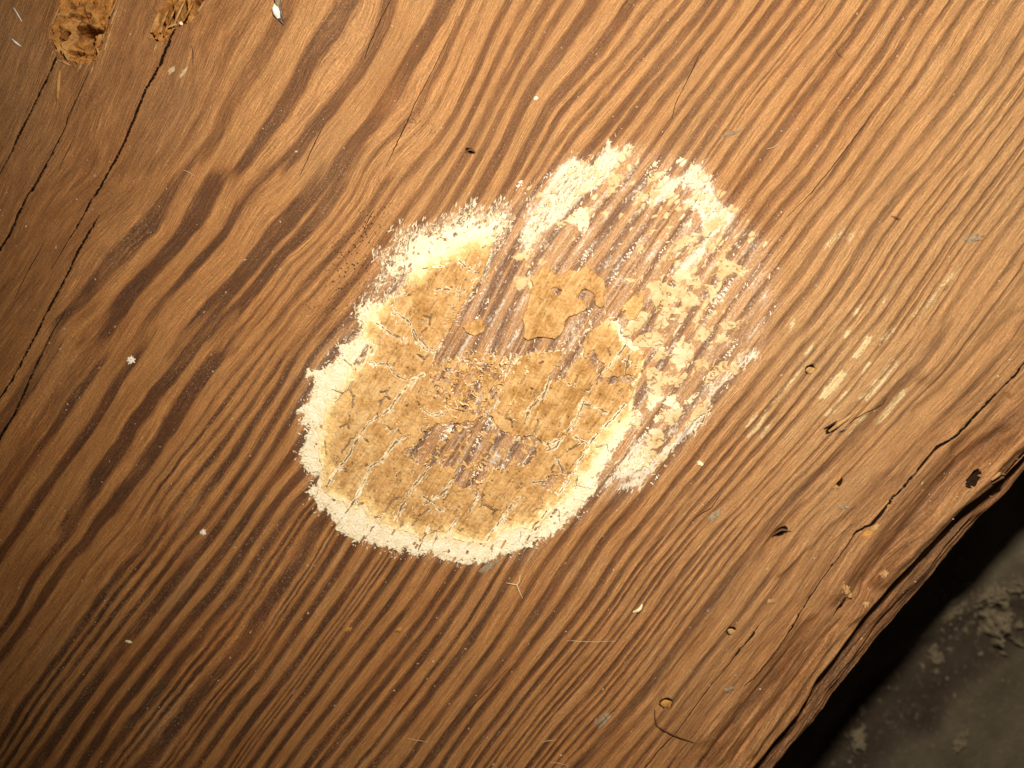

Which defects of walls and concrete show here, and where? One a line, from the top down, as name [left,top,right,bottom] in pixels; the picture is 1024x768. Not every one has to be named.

crack [0,30,175,440]
crack [645,363,1024,768]